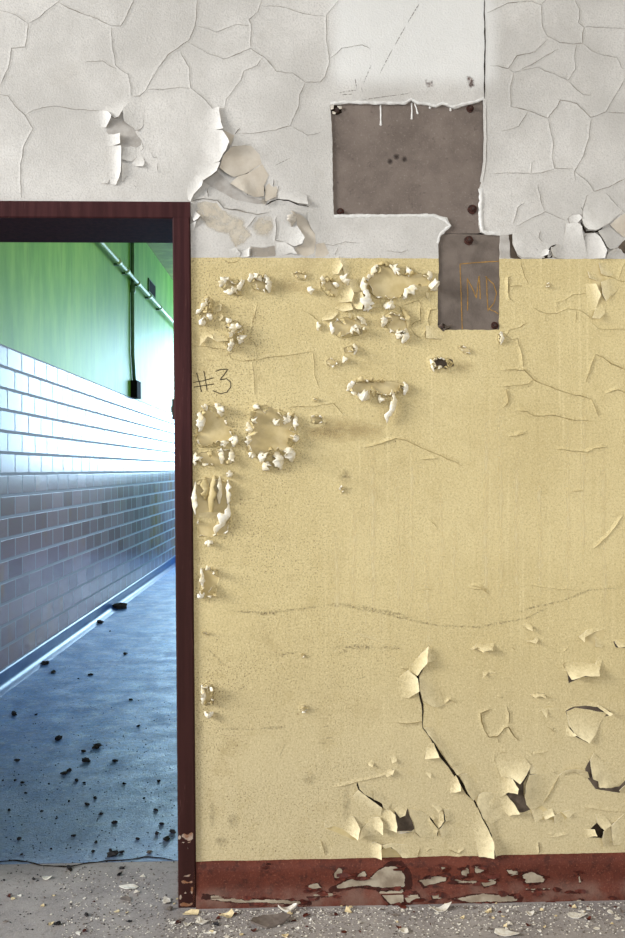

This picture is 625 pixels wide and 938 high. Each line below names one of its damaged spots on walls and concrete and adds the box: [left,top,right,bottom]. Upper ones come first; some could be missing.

peeling [96,94,145,185]
crack [0,0,371,198]
crack [191,166,310,250]
peeling [187,100,625,370]
crack [480,0,625,456]
peeling [344,374,410,423]
peeling [191,395,326,547]
peeling [195,563,223,602]
peeling [565,625,625,683]
crack [395,646,521,859]
peeling [495,693,625,824]
peeling [584,813,625,847]